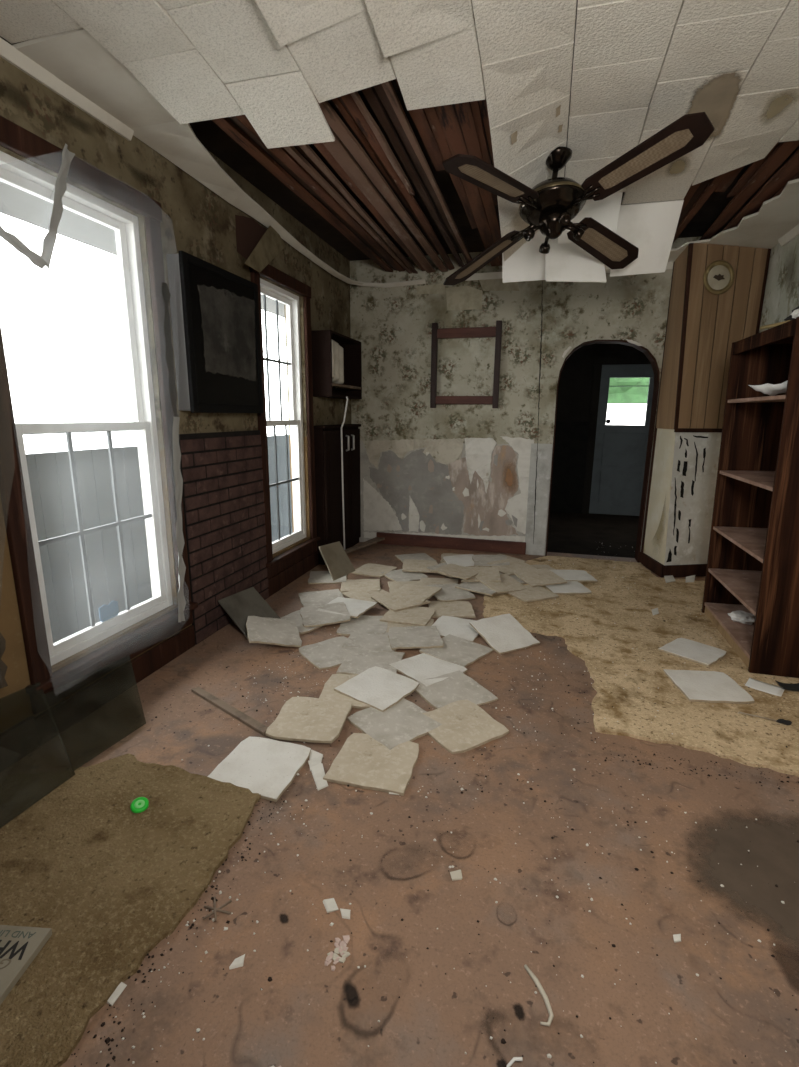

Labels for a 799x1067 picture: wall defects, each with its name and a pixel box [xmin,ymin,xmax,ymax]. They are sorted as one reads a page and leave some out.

water stain [687,72,741,139]
water stain [767,94,794,119]
flaking render [212,63,502,274]
flaking render [646,140,799,243]
peeling [363,436,534,542]
water stain [696,816,799,989]